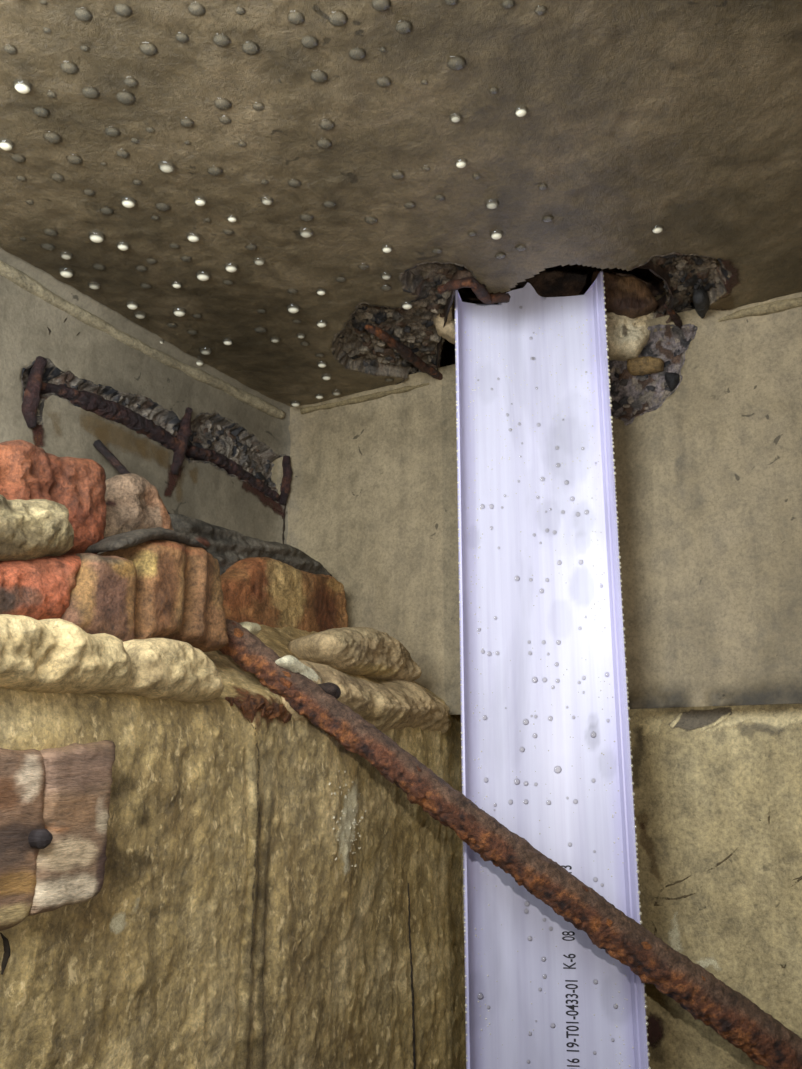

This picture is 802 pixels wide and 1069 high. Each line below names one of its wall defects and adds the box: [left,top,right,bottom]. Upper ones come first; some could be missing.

corrosion [709,260,739,310]
spalling [331,261,510,385]
spalling [608,252,732,426]
corrosion [32,424,45,447]
spalling [21,356,293,509]
corrosion [164,466,196,497]
corrosion [242,481,284,517]
corrosion [225,687,292,725]
crack [654,850,736,933]
corrosion [647,1014,664,1048]